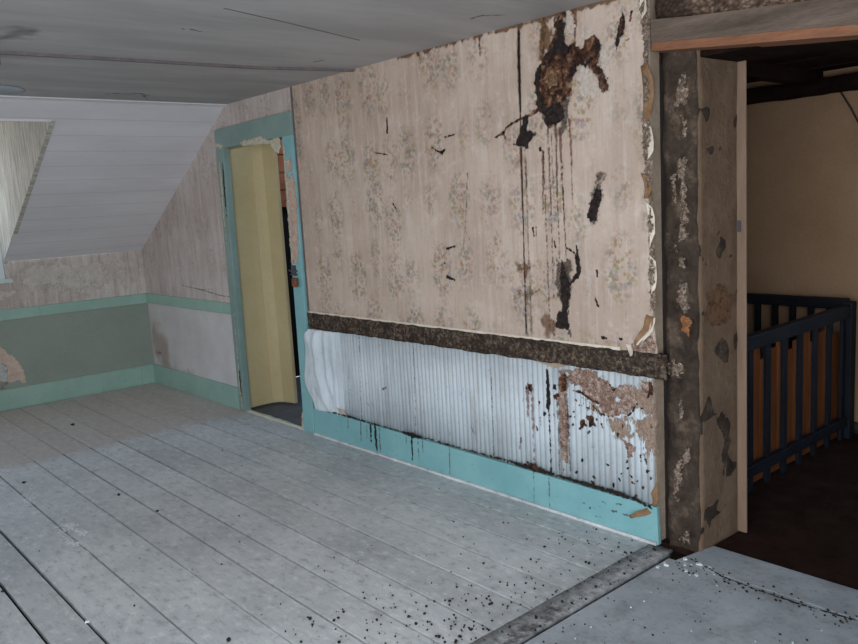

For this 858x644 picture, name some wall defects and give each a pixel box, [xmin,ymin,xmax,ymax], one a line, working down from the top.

leakage [397,0,615,300]
peeling [680,314,693,337]
peeling [0,347,26,390]